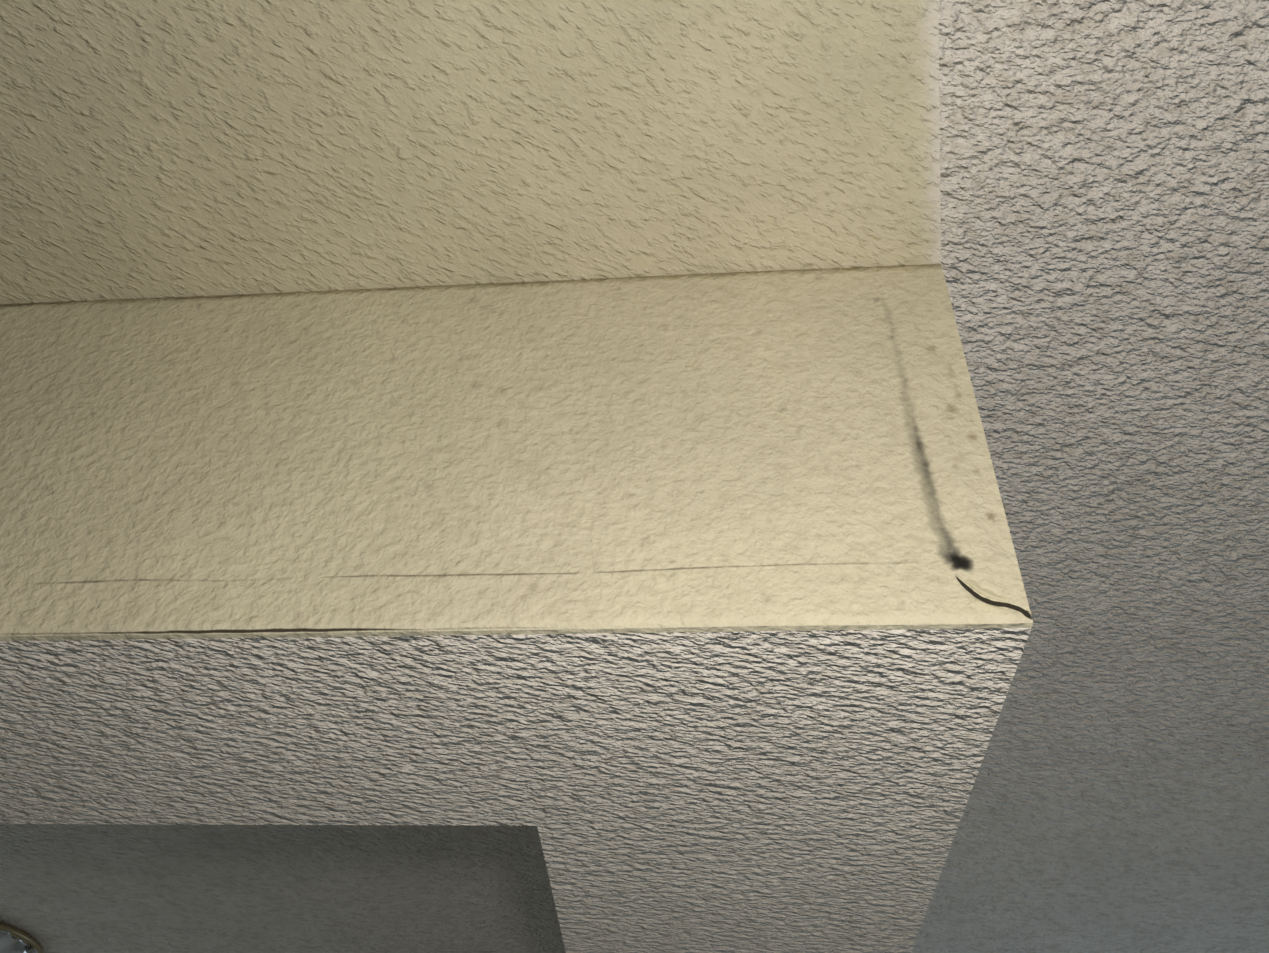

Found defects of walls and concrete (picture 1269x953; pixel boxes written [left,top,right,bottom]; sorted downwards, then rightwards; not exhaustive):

crack [956,577,1032,619]